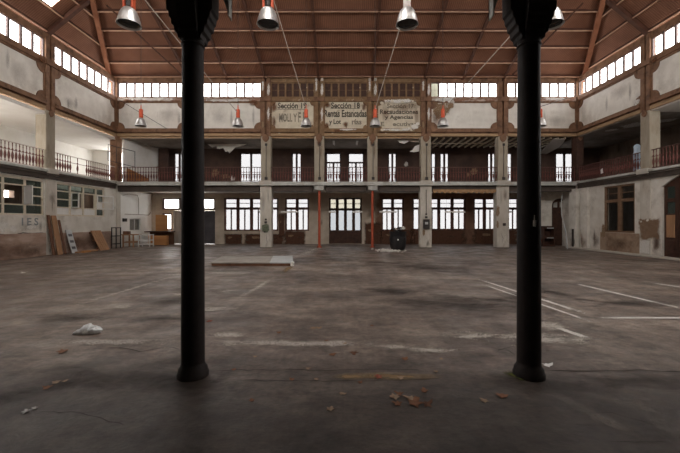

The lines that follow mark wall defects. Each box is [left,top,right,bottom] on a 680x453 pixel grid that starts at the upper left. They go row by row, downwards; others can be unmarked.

peeling [381,81,454,131]
peeling [208,144,246,153]
spalling [638,218,661,254]